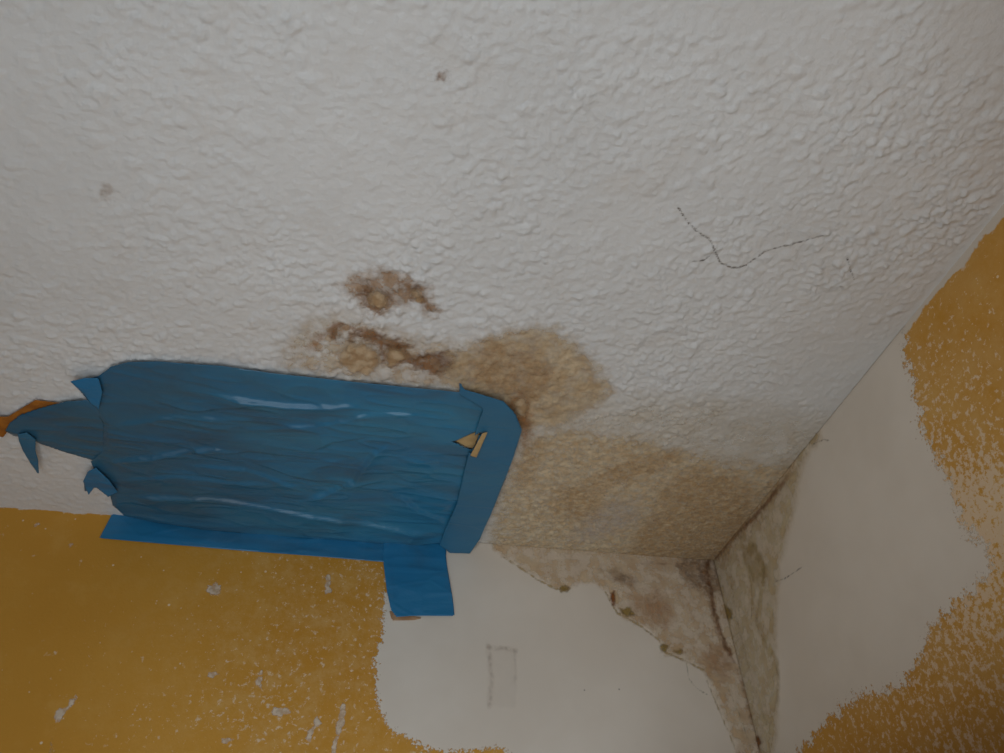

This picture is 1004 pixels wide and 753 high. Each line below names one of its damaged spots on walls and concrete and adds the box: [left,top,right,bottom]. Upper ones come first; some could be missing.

leakage [345,271,437,312]
leakage [303,323,796,753]
peeling [371,325,999,753]